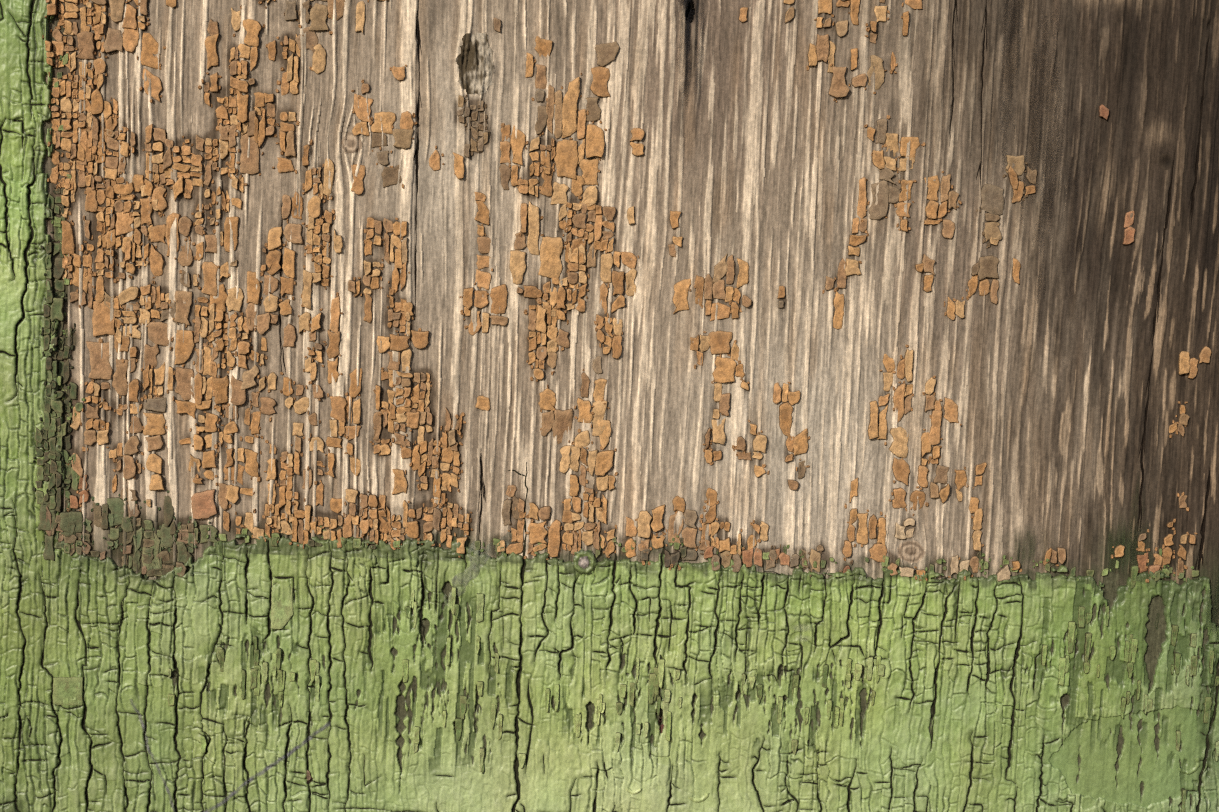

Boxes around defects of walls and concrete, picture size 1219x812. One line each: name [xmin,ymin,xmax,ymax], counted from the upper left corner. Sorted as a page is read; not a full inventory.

crack [0,0,66,402]
crack [278,205,286,373]
crack [413,0,422,310]
peeling [32,0,1022,582]
peeling [944,155,1037,320]
crack [1137,22,1210,531]
peeling [1178,346,1211,379]
peeling [391,581,502,779]
crack [0,455,1105,812]
peeling [575,654,714,758]
peeling [1033,519,1219,812]
crack [1187,642,1219,812]